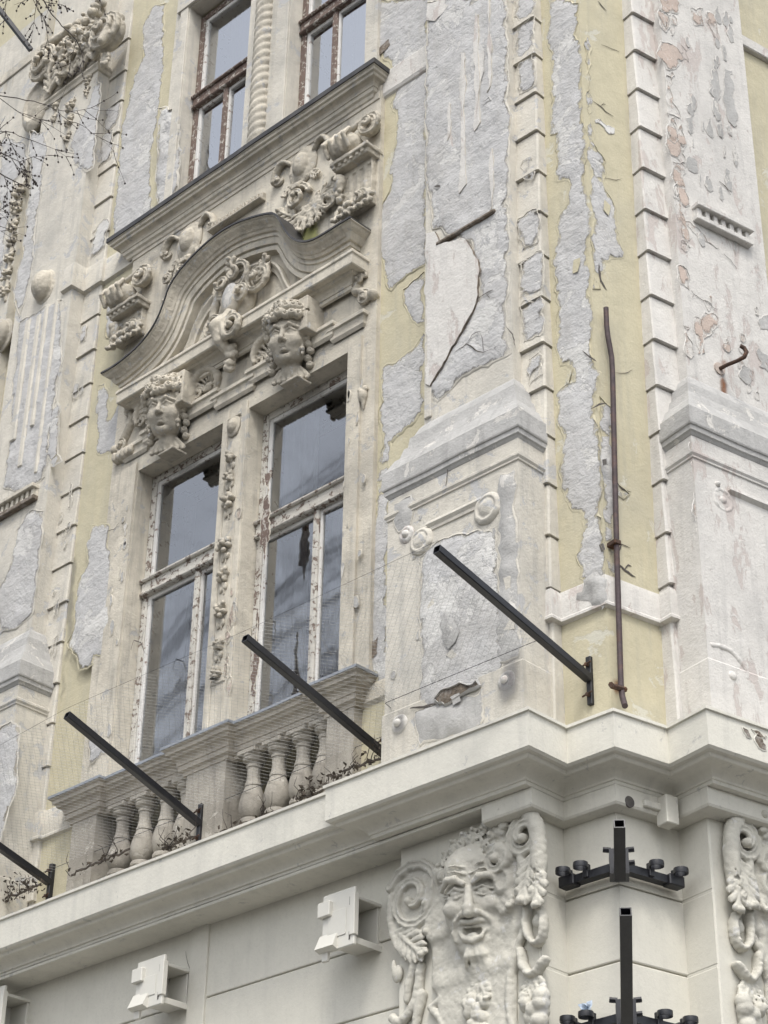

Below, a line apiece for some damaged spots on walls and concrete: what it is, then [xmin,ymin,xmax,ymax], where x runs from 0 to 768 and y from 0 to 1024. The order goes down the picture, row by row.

spalling [69,3,182,258]
peeling [656,0,739,252]
crack [459,328,515,353]
spalling [361,0,630,682]
peeling [683,295,719,359]
spalling [0,509,44,634]
spalling [50,504,129,672]
peeling [250,612,260,702]
peeling [259,472,272,561]
spalling [412,468,522,746]